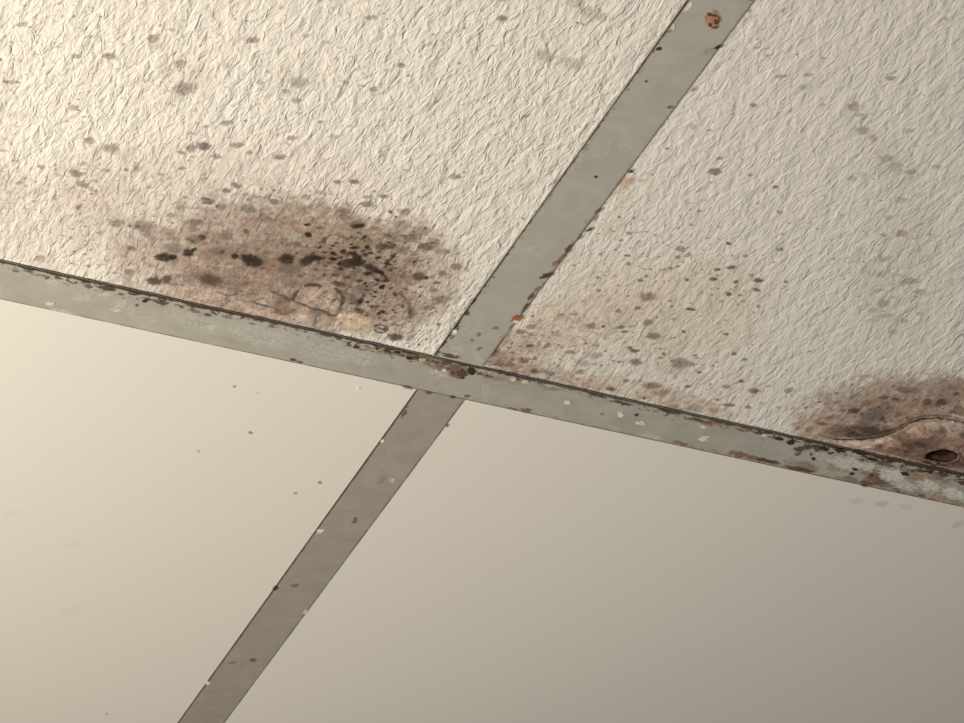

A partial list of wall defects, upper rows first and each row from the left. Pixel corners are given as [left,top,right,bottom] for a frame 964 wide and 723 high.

rust [704,10,721,30]
leakage [129,183,434,341]
rust [510,208,602,321]
rust [383,350,502,380]
leakage [487,312,572,378]
leakage [794,378,964,474]
peeling [762,434,964,507]